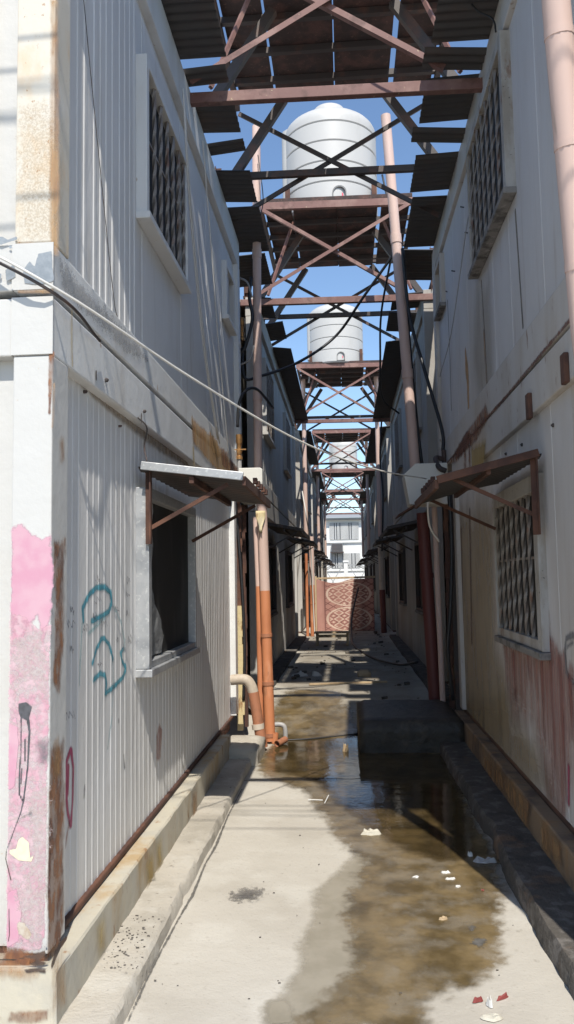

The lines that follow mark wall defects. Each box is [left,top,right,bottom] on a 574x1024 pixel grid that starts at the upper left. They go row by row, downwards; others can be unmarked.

corrosion [192,420,237,471]
corrosion [447,319,570,467]
corrosion [53,541,65,688]
corrosion [0,745,64,974]
peeling [0,614,67,973]
leakage [258,689,502,1024]